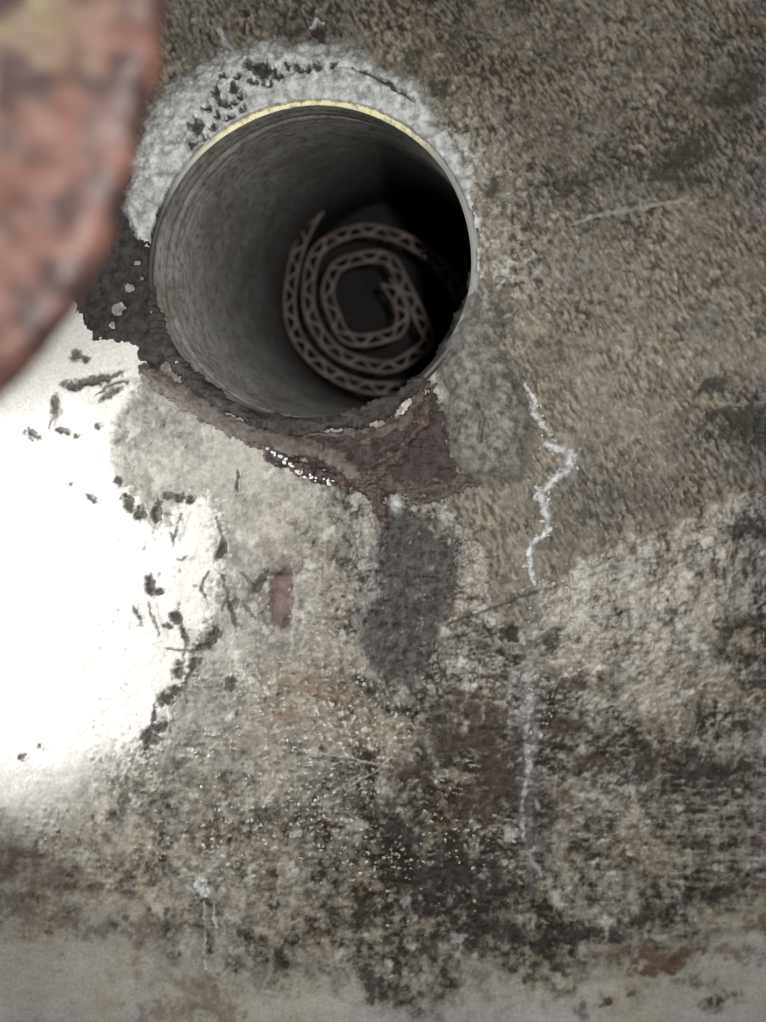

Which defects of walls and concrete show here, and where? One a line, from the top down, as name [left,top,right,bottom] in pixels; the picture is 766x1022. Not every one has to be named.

mould [720,518,766,540]
mould [658,608,687,625]
mould [713,613,766,637]
leakage [733,720,758,730]
leakage [304,689,528,826]
leakage [637,738,660,779]
leakage [673,748,750,788]
mould [701,879,766,901]
efflorescence [194,878,217,970]
mould [405,853,632,984]
mould [275,948,290,968]
mould [362,970,403,1005]